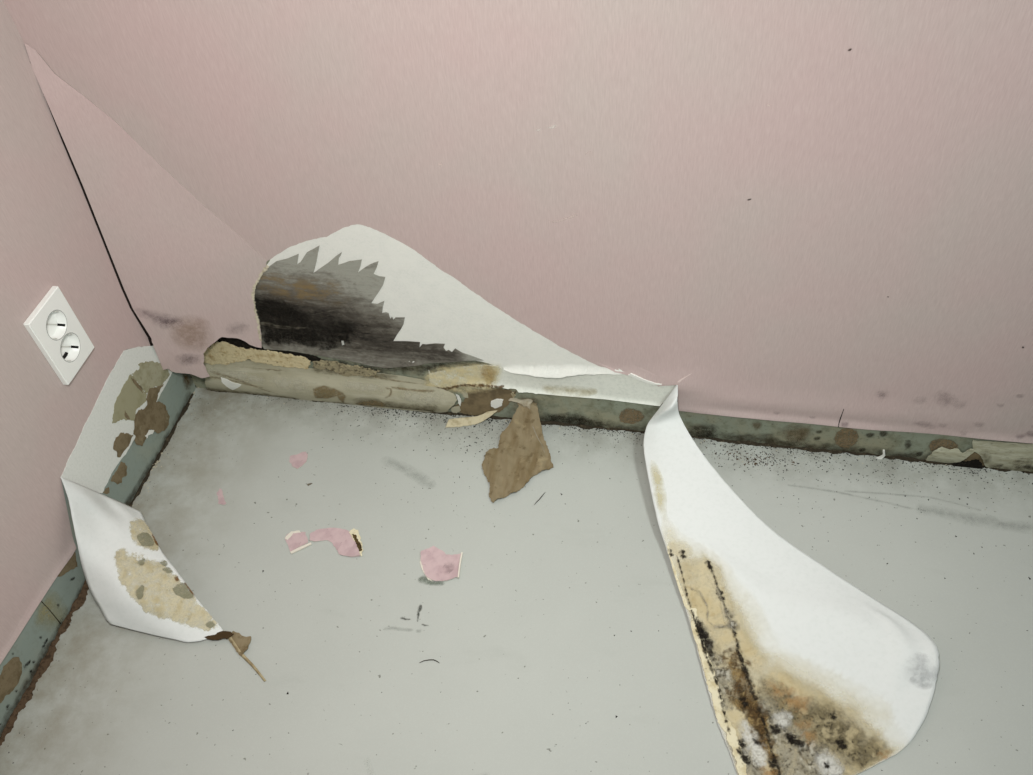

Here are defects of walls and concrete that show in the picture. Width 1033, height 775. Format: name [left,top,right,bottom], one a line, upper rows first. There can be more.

damp [184,245,484,413]
peeling [451,391,468,413]
peeling [60,477,266,682]
peeling [643,385,939,775]